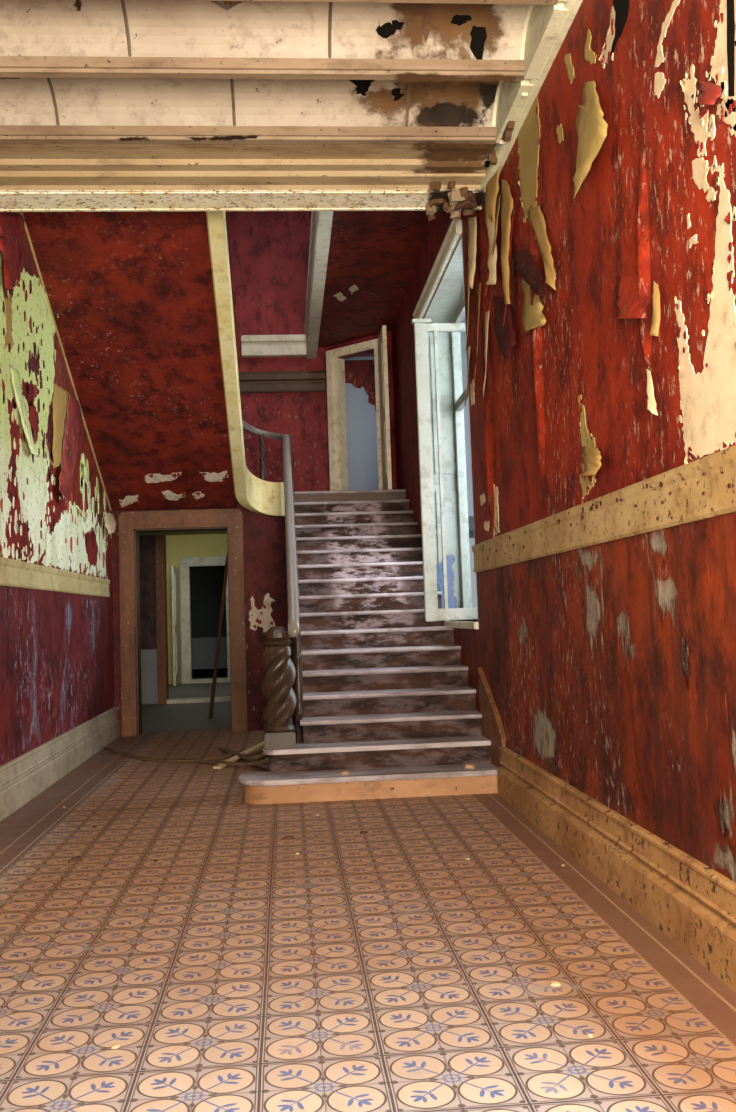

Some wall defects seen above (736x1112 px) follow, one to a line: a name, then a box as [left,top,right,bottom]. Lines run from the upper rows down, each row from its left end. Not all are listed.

leakage [353,72,516,120]
leakage [377,3,504,60]
flaking render [565,6,615,84]
peeling [654,0,680,98]
flaking render [484,93,540,222]
flaking render [674,64,736,465]
flaking render [0,251,139,579]
flaking render [145,471,228,501]
flaking render [545,395,602,526]
flaking render [249,593,276,633]